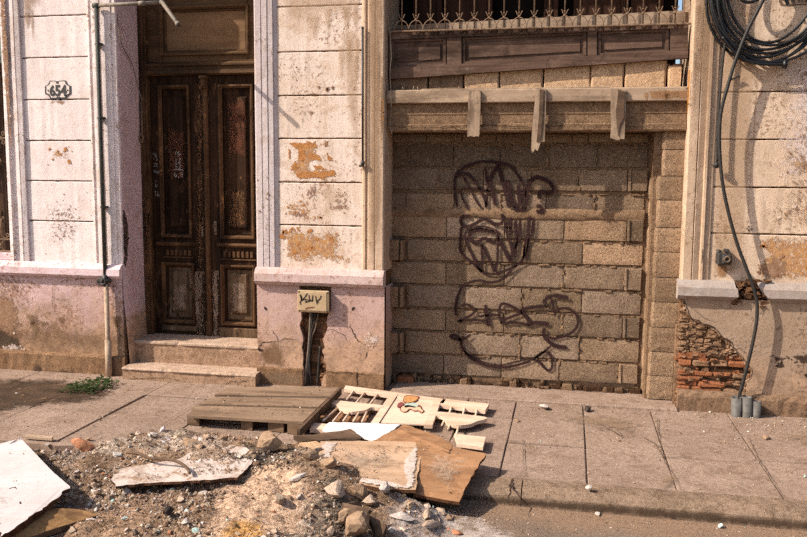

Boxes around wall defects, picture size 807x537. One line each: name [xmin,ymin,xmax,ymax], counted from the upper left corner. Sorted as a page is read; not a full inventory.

peeling [288,141,337,180]
peeling [771,48,807,229]
peeling [259,188,350,264]
peeling [731,237,807,308]
damp [0,331,19,348]
damp [28,316,64,341]
spalling [300,312,329,386]
crack [326,317,367,384]
flaking render [672,299,751,405]
flaking render [769,352,807,368]